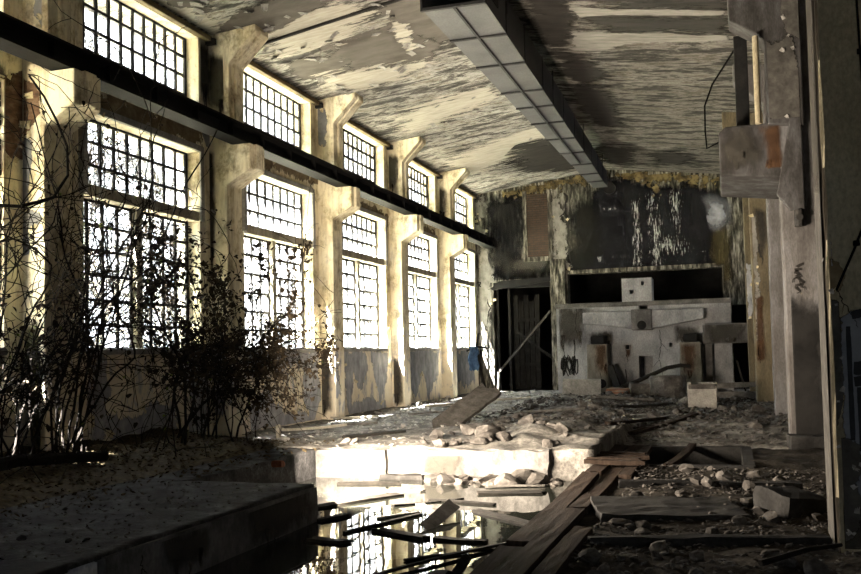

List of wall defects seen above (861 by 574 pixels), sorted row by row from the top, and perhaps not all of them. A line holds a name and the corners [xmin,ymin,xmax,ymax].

peeling [156,0,231,35]
peeling [259,0,447,96]
peeling [264,158,318,185]
peeling [318,108,328,147]
peeling [378,83,501,134]
peeling [442,124,545,175]
damp [393,358,403,406]